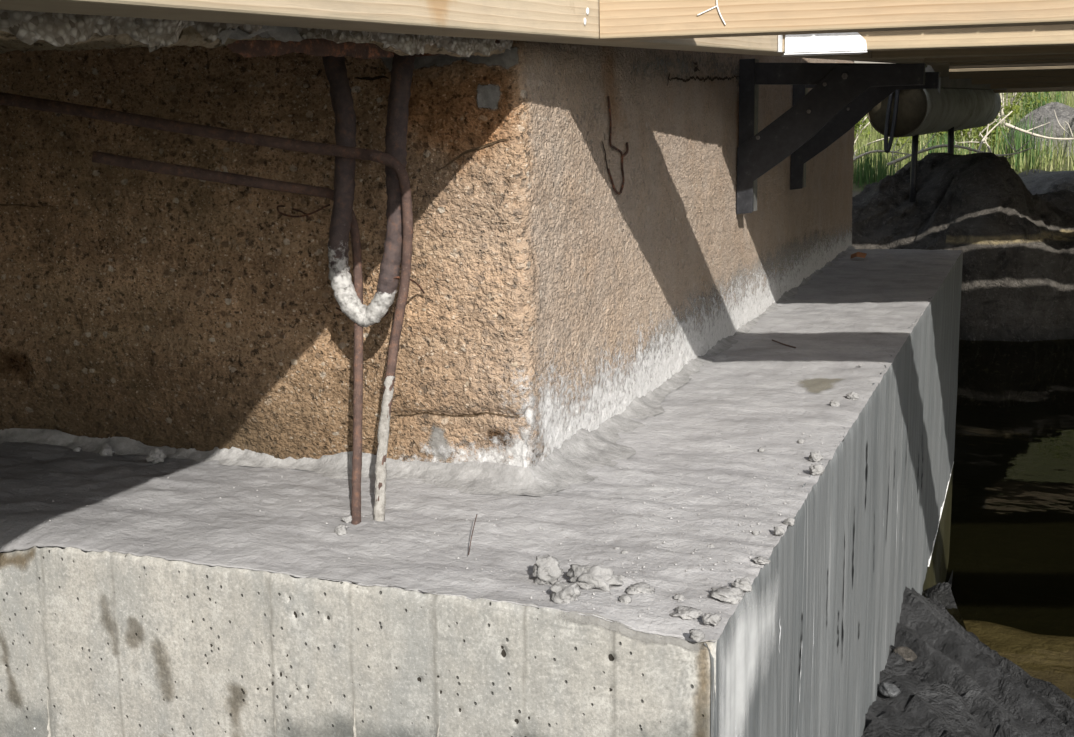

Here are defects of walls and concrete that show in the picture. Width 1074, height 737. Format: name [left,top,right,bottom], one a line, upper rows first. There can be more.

spalling [217,25,304,44]
rust [227,38,395,59]
crack [667,62,739,86]
spalling [0,53,415,525]
leakage [801,379,841,393]
crack [395,410,526,418]